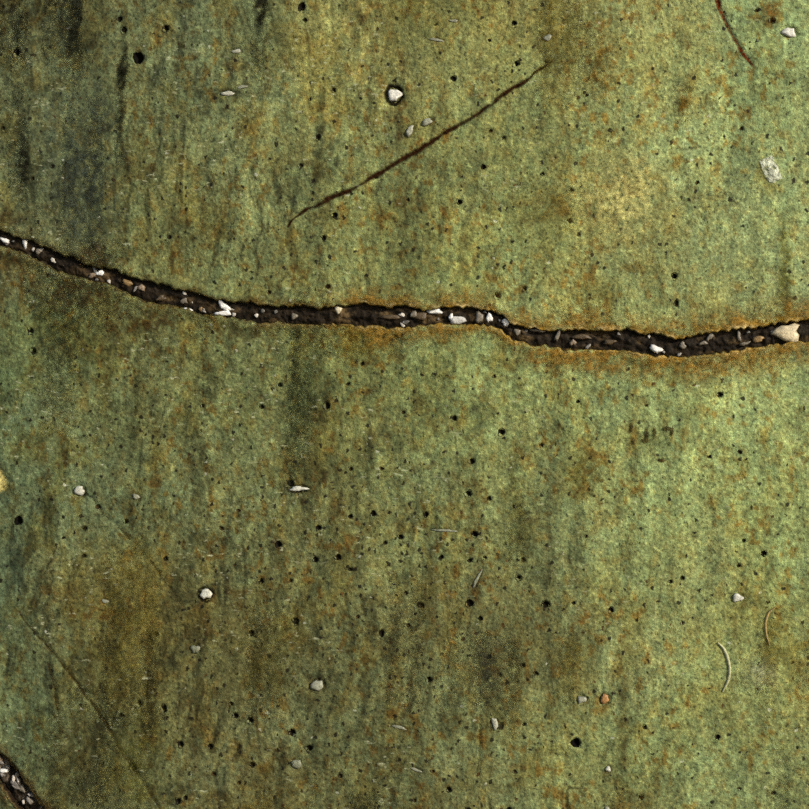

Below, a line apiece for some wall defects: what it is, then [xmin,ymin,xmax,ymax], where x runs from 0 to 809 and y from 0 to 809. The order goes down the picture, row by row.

damp [69,0,83,52]
damp [118,46,128,138]
damp [19,137,29,192]
crack [288,60,553,227]
crack [0,212,809,376]
crack [0,747,50,809]